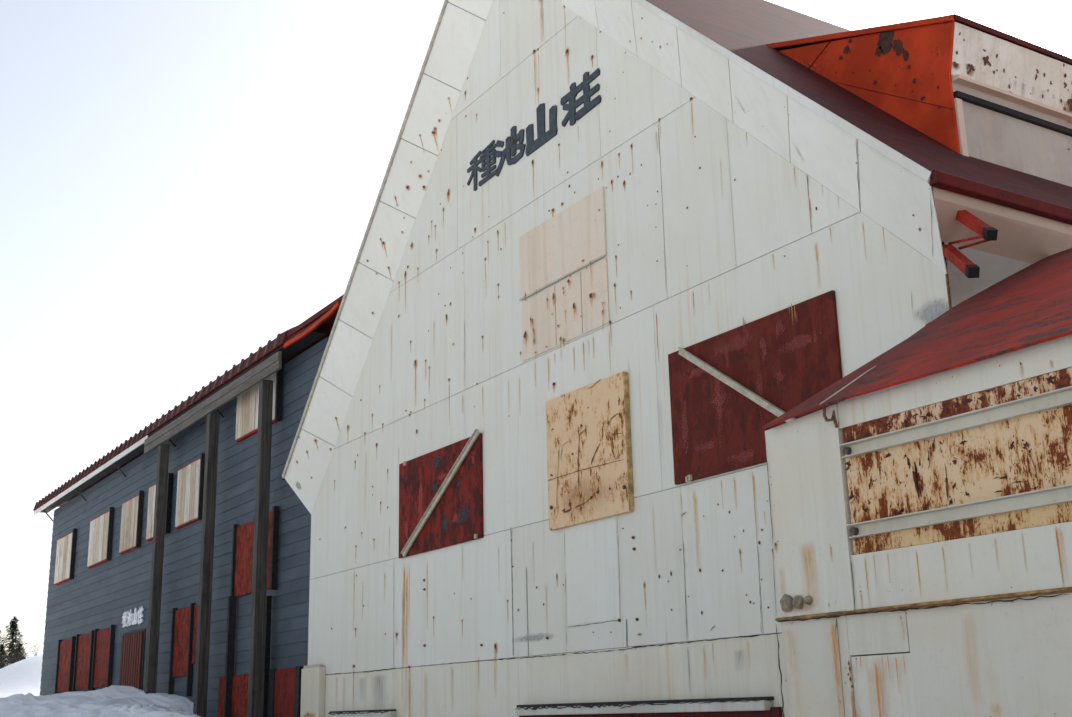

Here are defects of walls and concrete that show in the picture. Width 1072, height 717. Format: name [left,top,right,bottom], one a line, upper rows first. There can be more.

peeling [875,31,925,100]
corrosion [875,657,905,717]